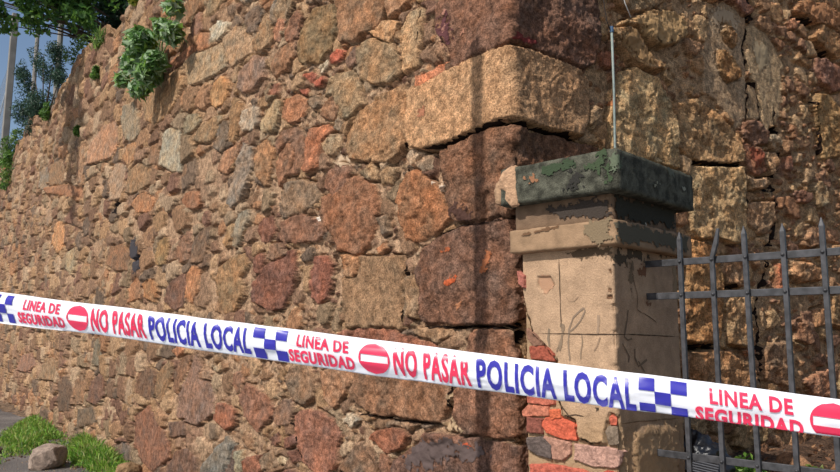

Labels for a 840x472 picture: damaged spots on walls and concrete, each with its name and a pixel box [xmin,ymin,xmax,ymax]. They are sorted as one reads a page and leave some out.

crack [741,0,775,121]
crack [404,119,572,172]
spalling [506,299,557,363]
spalling [533,400,576,423]
spalling [528,413,629,472]